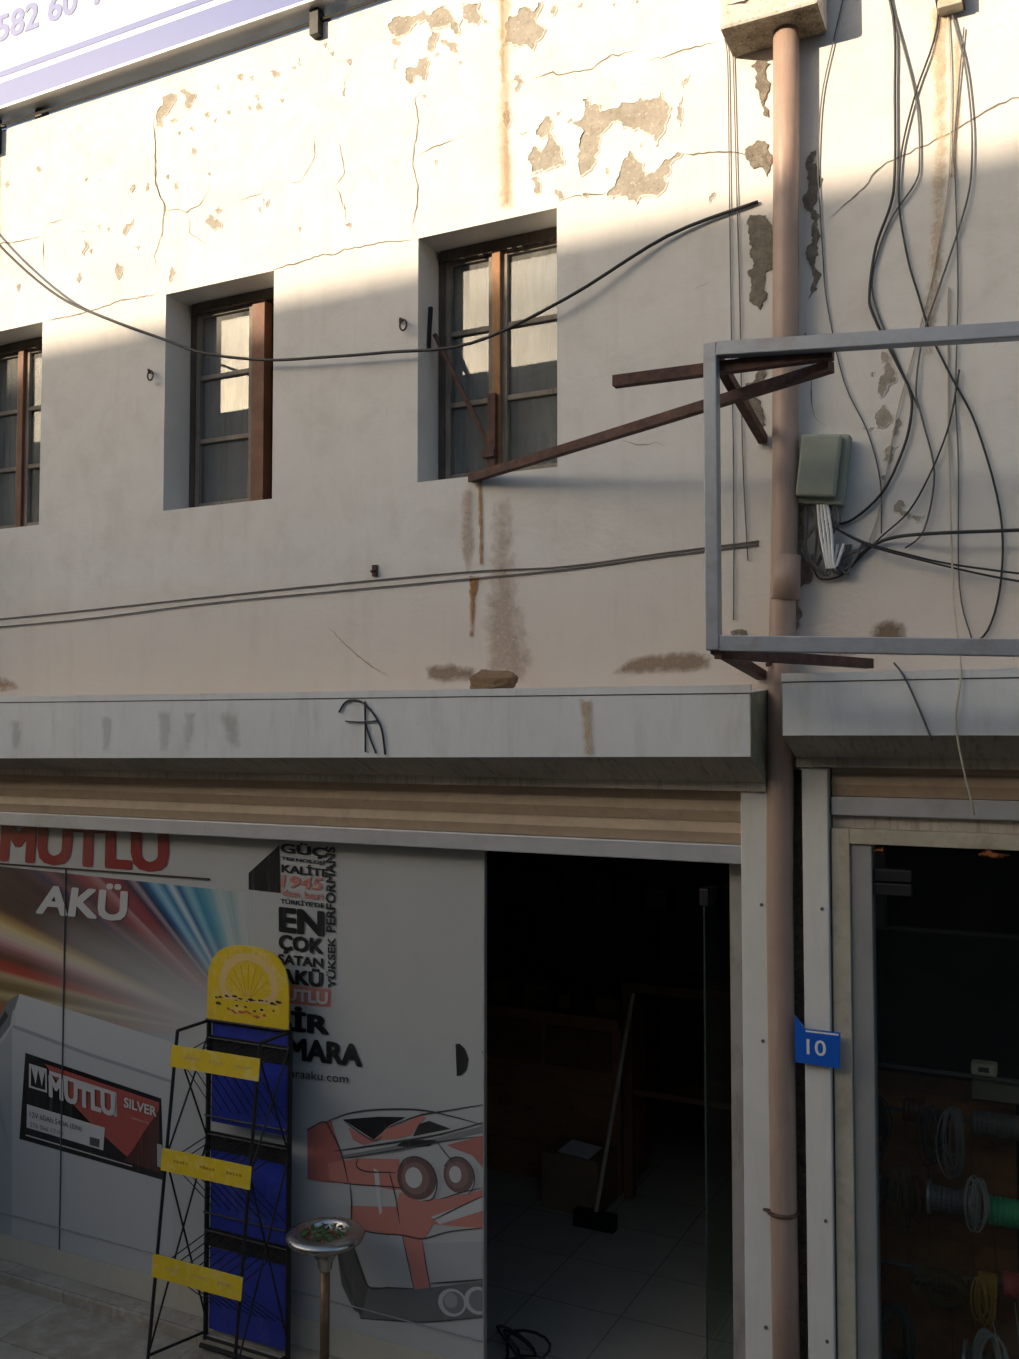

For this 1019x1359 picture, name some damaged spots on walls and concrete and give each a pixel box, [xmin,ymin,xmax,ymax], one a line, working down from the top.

peeling [386,1,488,98]
peeling [503,1,558,52]
spalling [751,59,771,117]
crack [53,123,209,320]
crack [245,91,456,270]
peeling [502,73,690,205]
spalling [745,140,773,176]
spalling [746,214,773,309]
corrosion [470,481,483,636]
water stain [429,666,472,680]
water stain [623,655,705,671]
water stain [874,622,901,637]